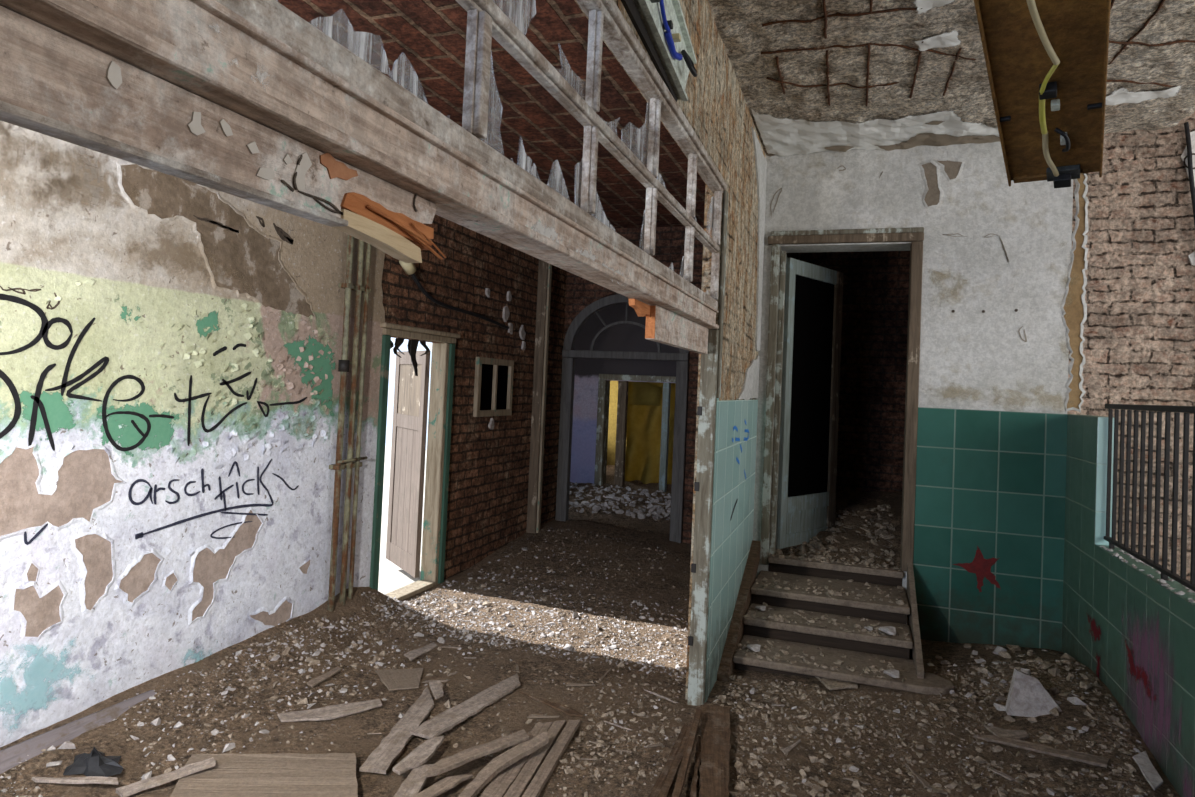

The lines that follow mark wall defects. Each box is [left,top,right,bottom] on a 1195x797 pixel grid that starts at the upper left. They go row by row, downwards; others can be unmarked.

peeling [106,61,122,89]
peeling [751,0,1000,209]
peeling [1106,80,1181,105]
peeling [187,112,205,136]
peeling [246,141,260,154]
peeling [117,161,332,469]
flaking render [0,441,265,642]
flaking render [297,557,311,576]
flaking render [247,596,295,628]